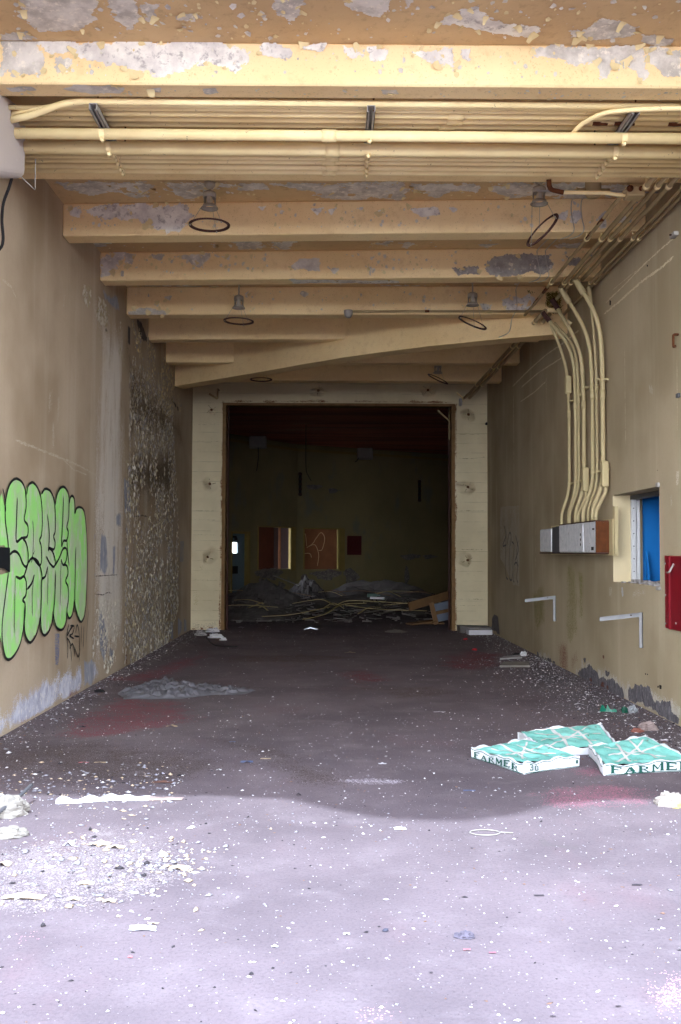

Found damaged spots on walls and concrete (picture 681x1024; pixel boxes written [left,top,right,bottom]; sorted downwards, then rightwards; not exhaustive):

peeling [0,0,681,97]
peeling [55,180,638,235]
peeling [451,240,592,315]
peeling [0,241,298,734]